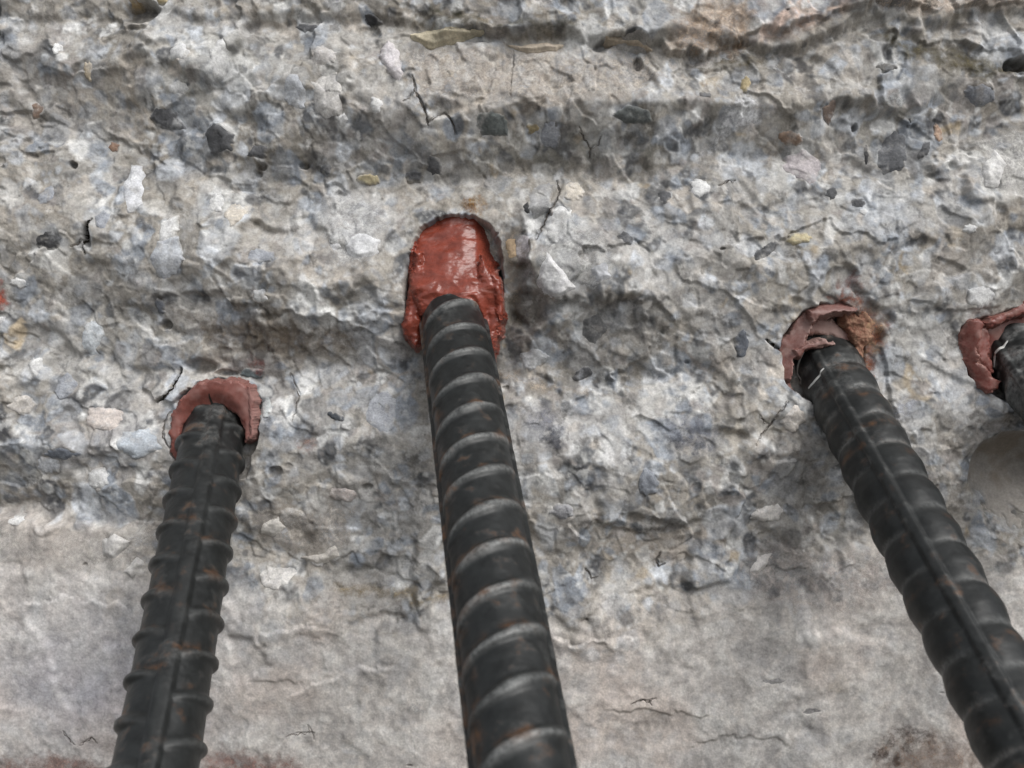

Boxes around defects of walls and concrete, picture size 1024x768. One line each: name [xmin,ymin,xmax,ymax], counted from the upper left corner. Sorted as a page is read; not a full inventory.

rust [837,276,886,370]